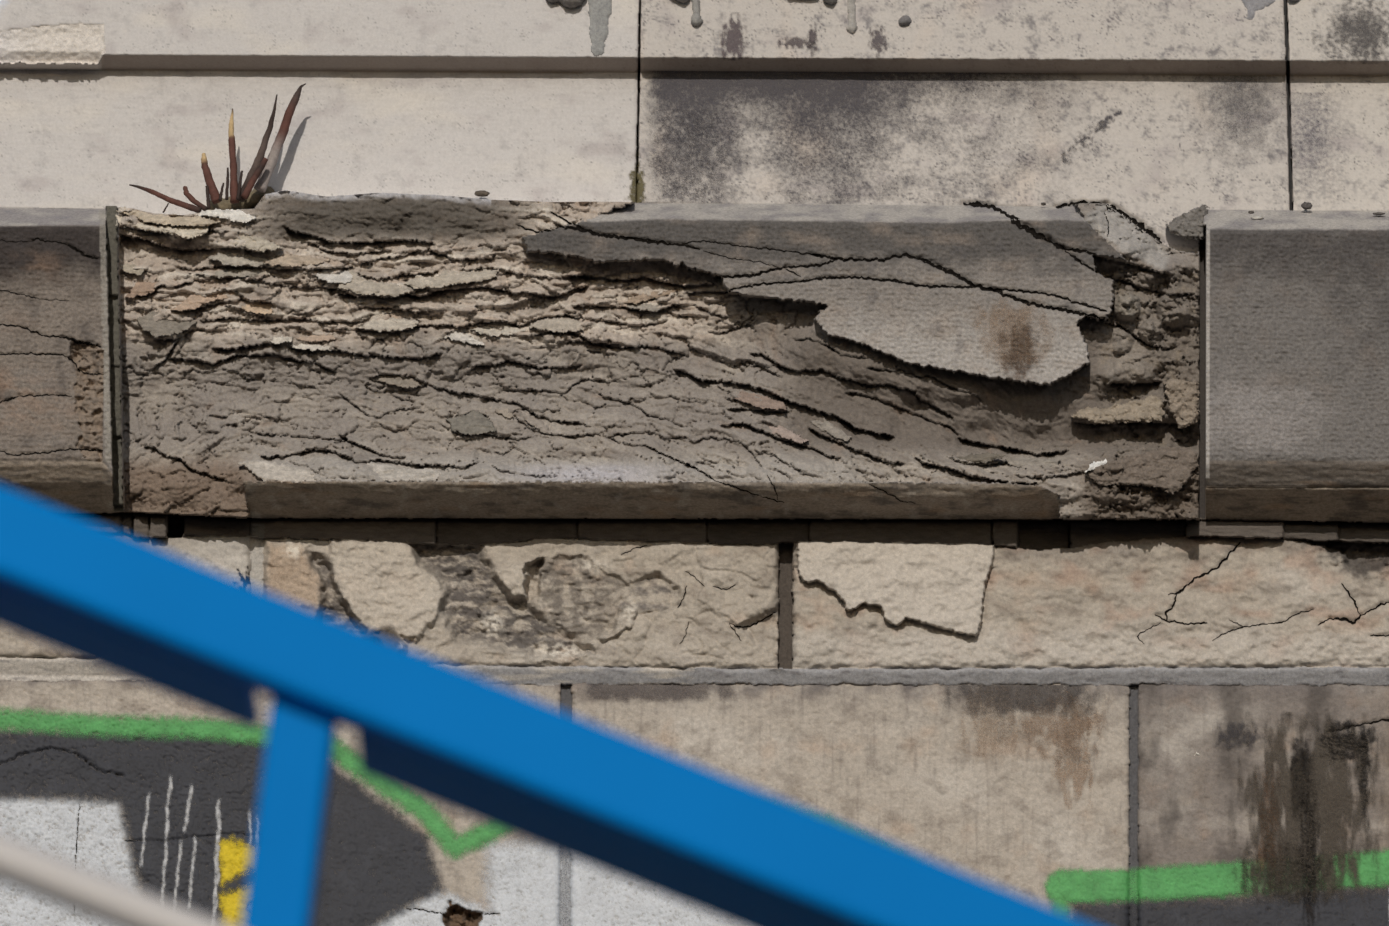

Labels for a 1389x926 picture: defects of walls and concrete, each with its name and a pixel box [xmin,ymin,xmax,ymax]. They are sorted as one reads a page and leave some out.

spalling [0,23,106,65]
water stain [651,18,1047,204]
water stain [1062,111,1121,163]
water stain [1210,75,1270,143]
crack [517,200,1162,321]
crack [0,290,104,403]
spalling [115,190,1200,521]
crack [1,448,103,456]
spalling [412,544,686,661]
peeling [797,541,995,637]
crack [1137,542,1389,644]
water stain [1219,712,1378,920]